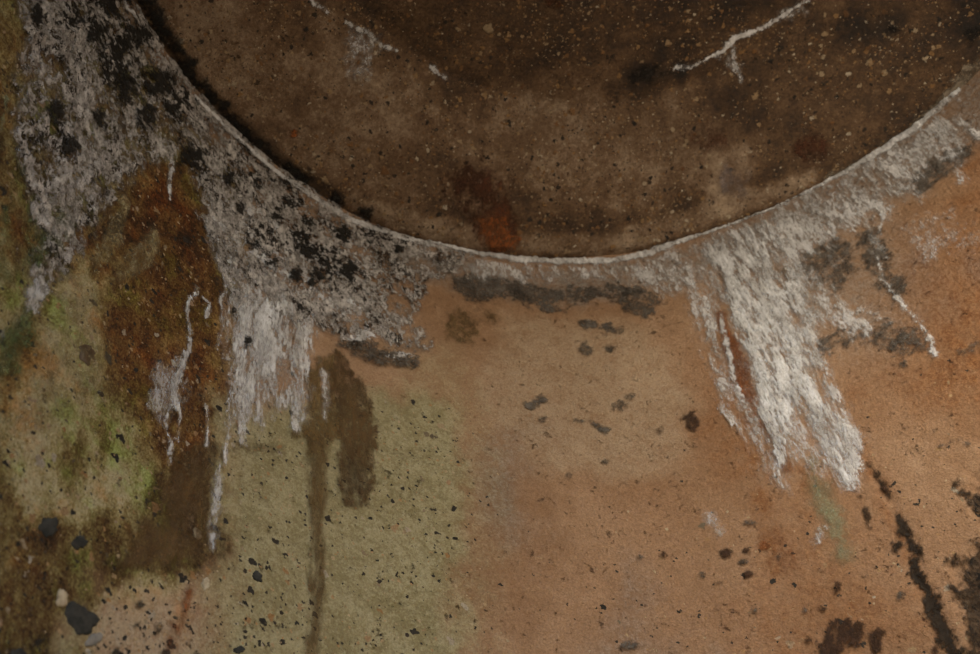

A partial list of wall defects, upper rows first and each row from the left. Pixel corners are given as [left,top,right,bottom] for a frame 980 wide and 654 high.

crack [311,0,398,72]
crack [673,0,809,72]
corrosion [441,159,522,253]
water stain [10,0,972,508]
water stain [117,291,230,575]
water stain [307,437,327,582]
water stain [306,585,324,654]